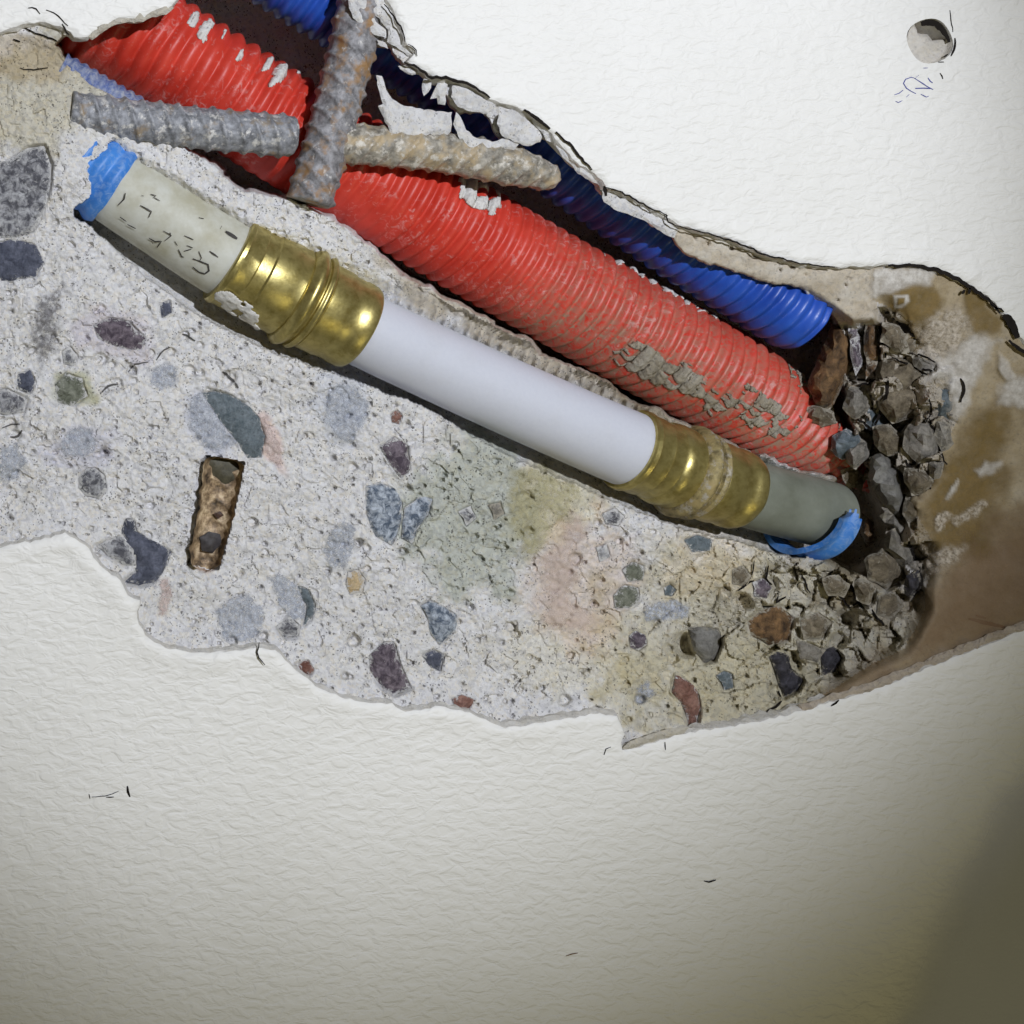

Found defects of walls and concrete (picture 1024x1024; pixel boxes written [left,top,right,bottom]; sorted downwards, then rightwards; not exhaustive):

spalling [0,0,1024,755]
water stain [887,283,942,347]
water stain [925,410,1024,645]